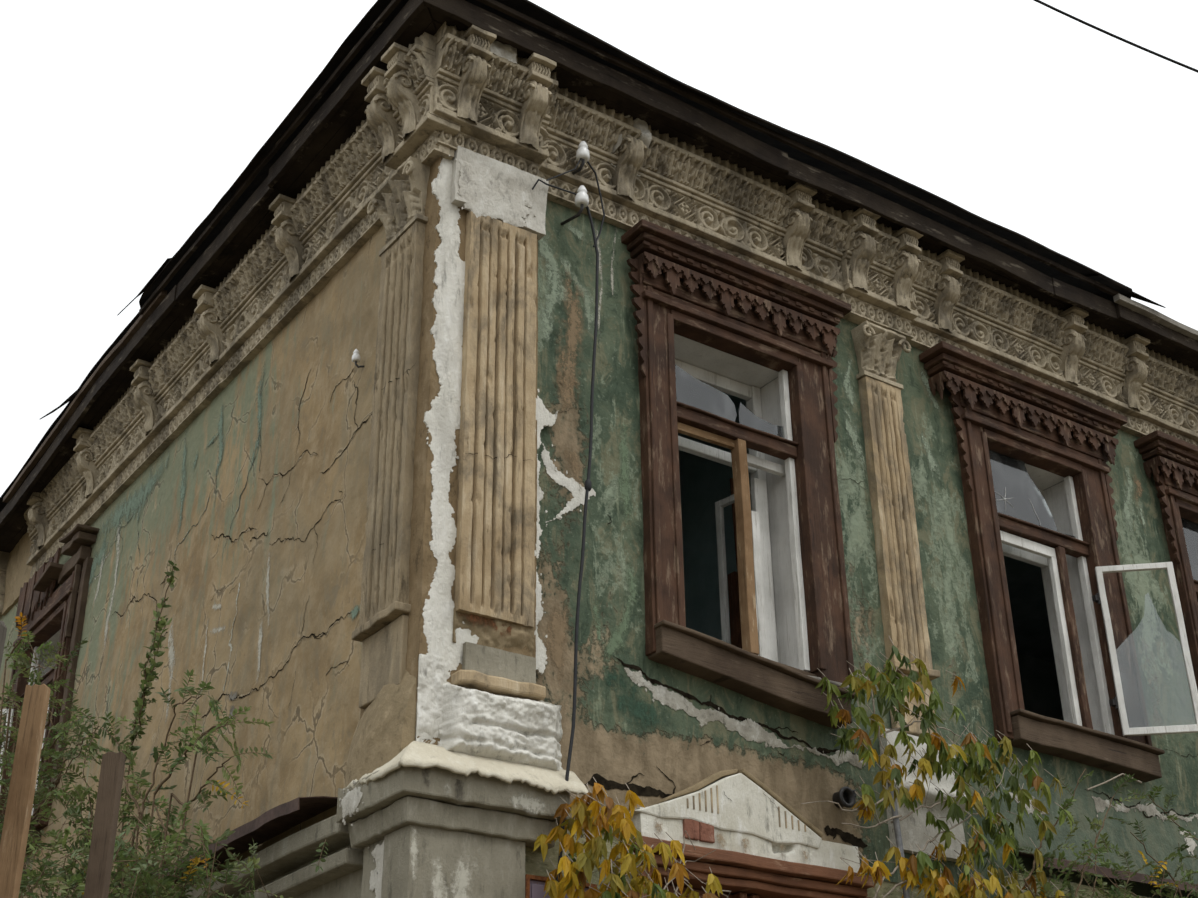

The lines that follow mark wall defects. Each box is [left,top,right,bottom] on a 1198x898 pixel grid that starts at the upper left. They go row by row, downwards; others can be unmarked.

water stain [88,411,224,649]
crack [93,366,413,637]
flaking render [414,155,537,744]
flaking render [534,389,596,675]
water stain [166,627,174,712]
water stain [258,559,270,671]
crack [203,583,354,717]
flaking render [624,667,865,769]
flaking render [1091,796,1198,857]